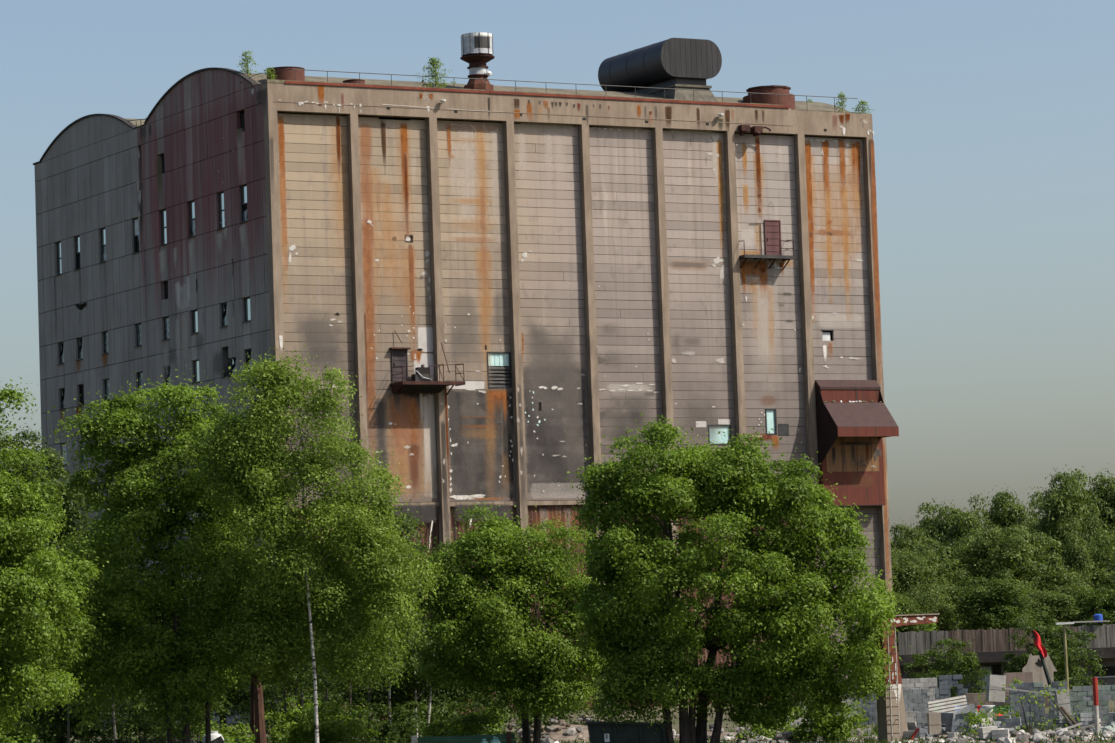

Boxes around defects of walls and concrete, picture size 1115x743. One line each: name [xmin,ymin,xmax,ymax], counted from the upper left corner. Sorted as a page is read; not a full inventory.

corrosion [278,117,287,247]
corrosion [401,124,409,224]
corrosion [447,125,455,158]
corrosion [833,114,850,125]
corrosion [360,125,376,450]
corrosion [740,260,784,290]
corrosion [805,139,881,355]
corrosion [411,348,423,362]
corrosion [391,395,420,490]
corrosion [469,390,508,418]
corrosion [832,442,890,577]